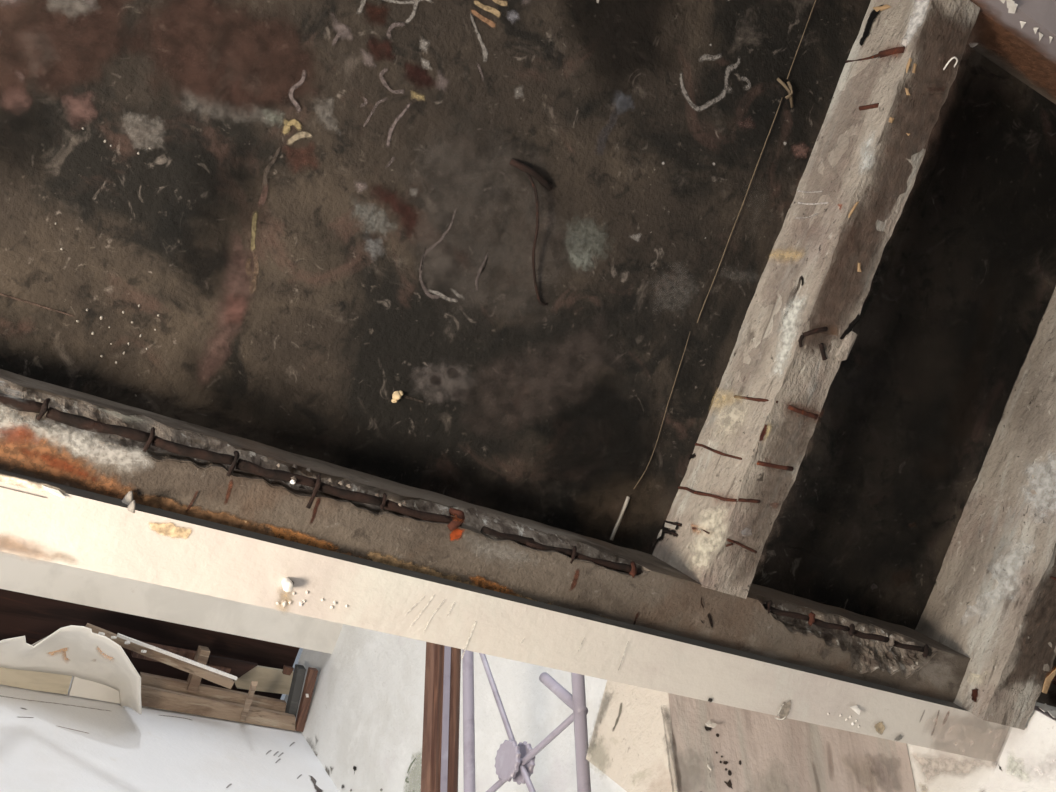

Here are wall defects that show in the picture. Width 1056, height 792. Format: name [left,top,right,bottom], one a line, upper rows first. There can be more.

corrosion [845,46,905,63]
corrosion [734,395,818,419]
corrosion [695,443,742,460]
corrosion [756,425,794,471]
spalling [0,380,645,578]
corrosion [678,486,779,508]
corrosion [0,429,552,605]
corrosion [726,538,757,553]
spalling [755,594,935,679]